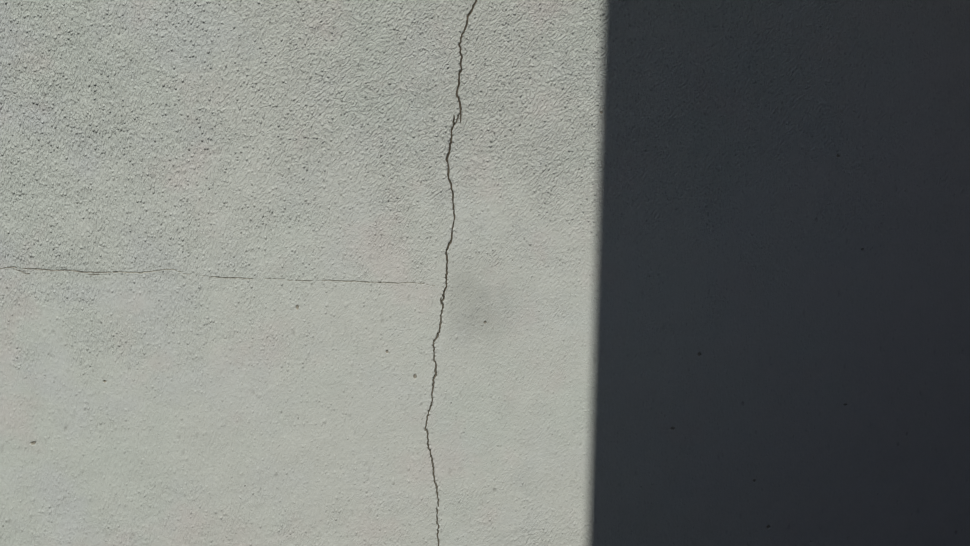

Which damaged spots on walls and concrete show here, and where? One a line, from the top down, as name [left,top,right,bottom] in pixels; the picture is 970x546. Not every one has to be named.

crack [0,0,477,546]